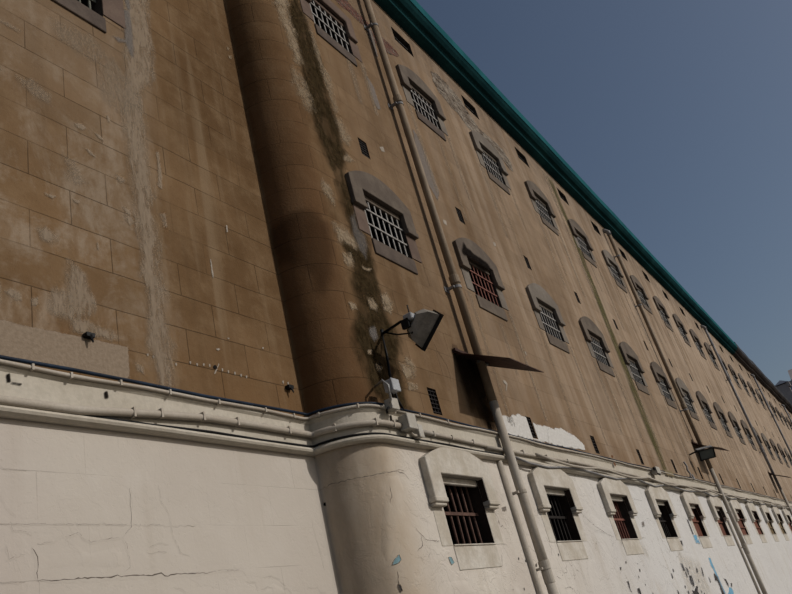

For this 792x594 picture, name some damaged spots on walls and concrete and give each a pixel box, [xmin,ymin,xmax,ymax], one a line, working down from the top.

leakage [116,0,173,387]
leakage [275,0,418,414]
crack [0,485,292,594]
flaking render [671,557,734,594]